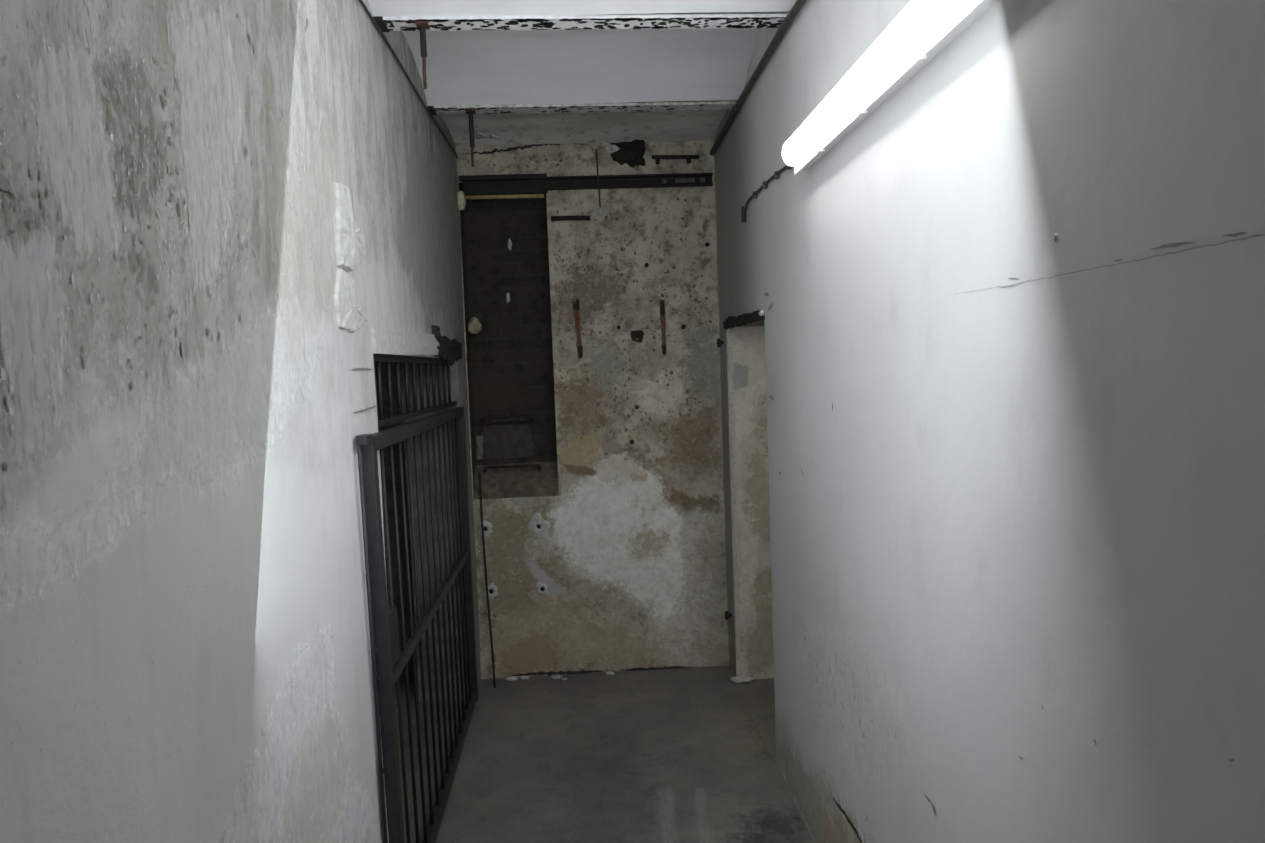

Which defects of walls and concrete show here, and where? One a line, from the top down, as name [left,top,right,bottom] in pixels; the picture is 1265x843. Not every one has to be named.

peeling [383,17,785,31]
peeling [0,47,319,417]
rust [572,299,583,358]
damp [624,324,722,511]
crack [956,232,1265,295]
damp [476,497,721,677]